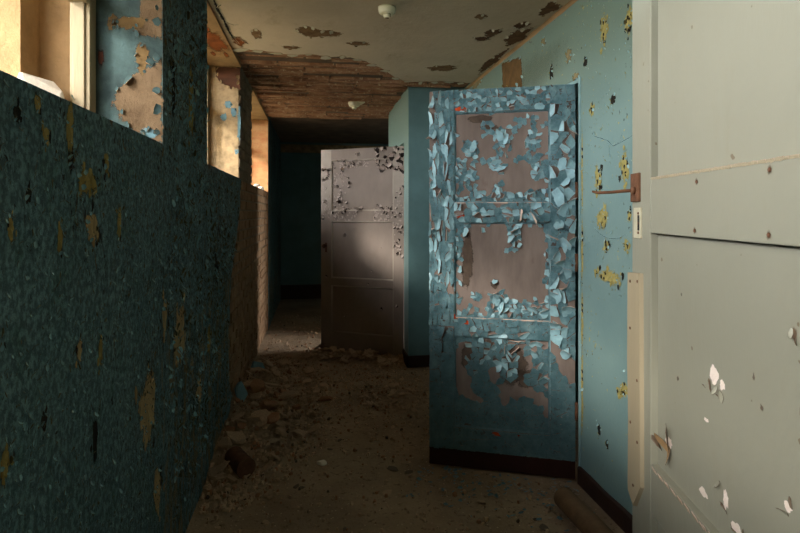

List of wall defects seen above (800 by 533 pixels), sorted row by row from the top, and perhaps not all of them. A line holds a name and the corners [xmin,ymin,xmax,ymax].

peeling [577,1,632,61]
peeling [66,95,111,248]
flaking render [107,0,268,392]
peeling [321,145,405,221]
peeling [373,185,404,259]
peeling [426,21,632,459]
peeling [134,358,158,453]
peeling [702,364,725,403]
peeling [651,428,672,465]
peeling [699,481,744,533]
peeling [776,496,793,516]